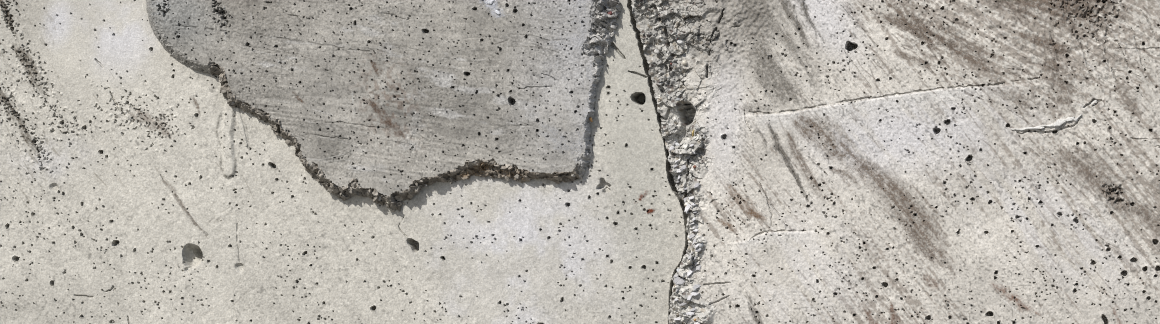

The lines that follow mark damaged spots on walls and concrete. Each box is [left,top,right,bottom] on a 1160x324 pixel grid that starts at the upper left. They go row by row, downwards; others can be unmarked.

peeling [146,0,720,324]
crack [609,0,691,324]
crack [705,0,725,78]
crack [703,281,731,306]